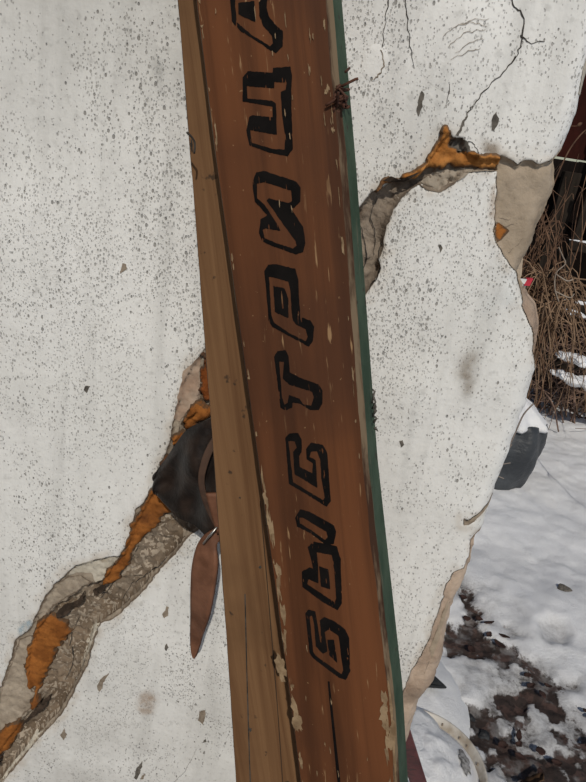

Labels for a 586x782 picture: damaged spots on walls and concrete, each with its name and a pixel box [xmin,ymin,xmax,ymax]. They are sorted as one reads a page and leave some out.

crack [359,0,545,294]
spalling [494,150,561,368]
crack [159,349,211,466]
crack [0,488,199,782]
spalling [379,493,493,782]